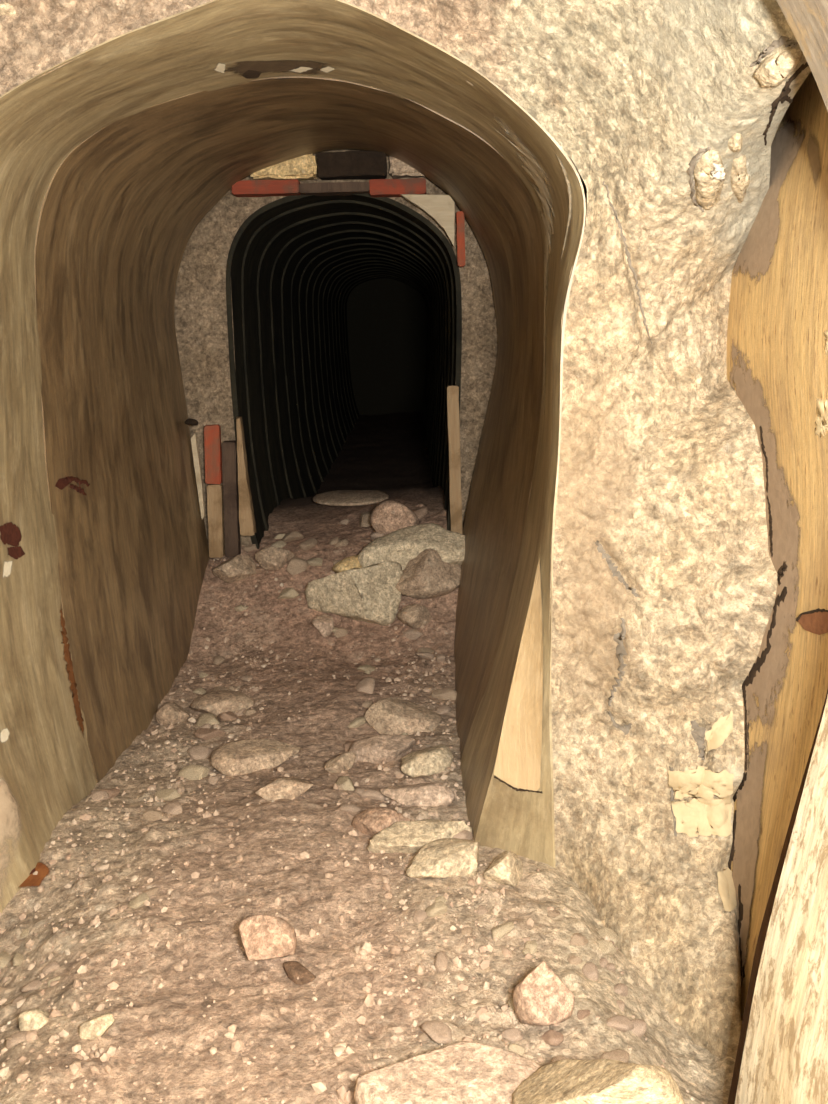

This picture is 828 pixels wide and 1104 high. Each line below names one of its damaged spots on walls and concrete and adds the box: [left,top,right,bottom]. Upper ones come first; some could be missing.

rust [55,476,90,495]
rust [0,522,25,578]
rust [60,608,84,737]
rust [19,862,50,887]